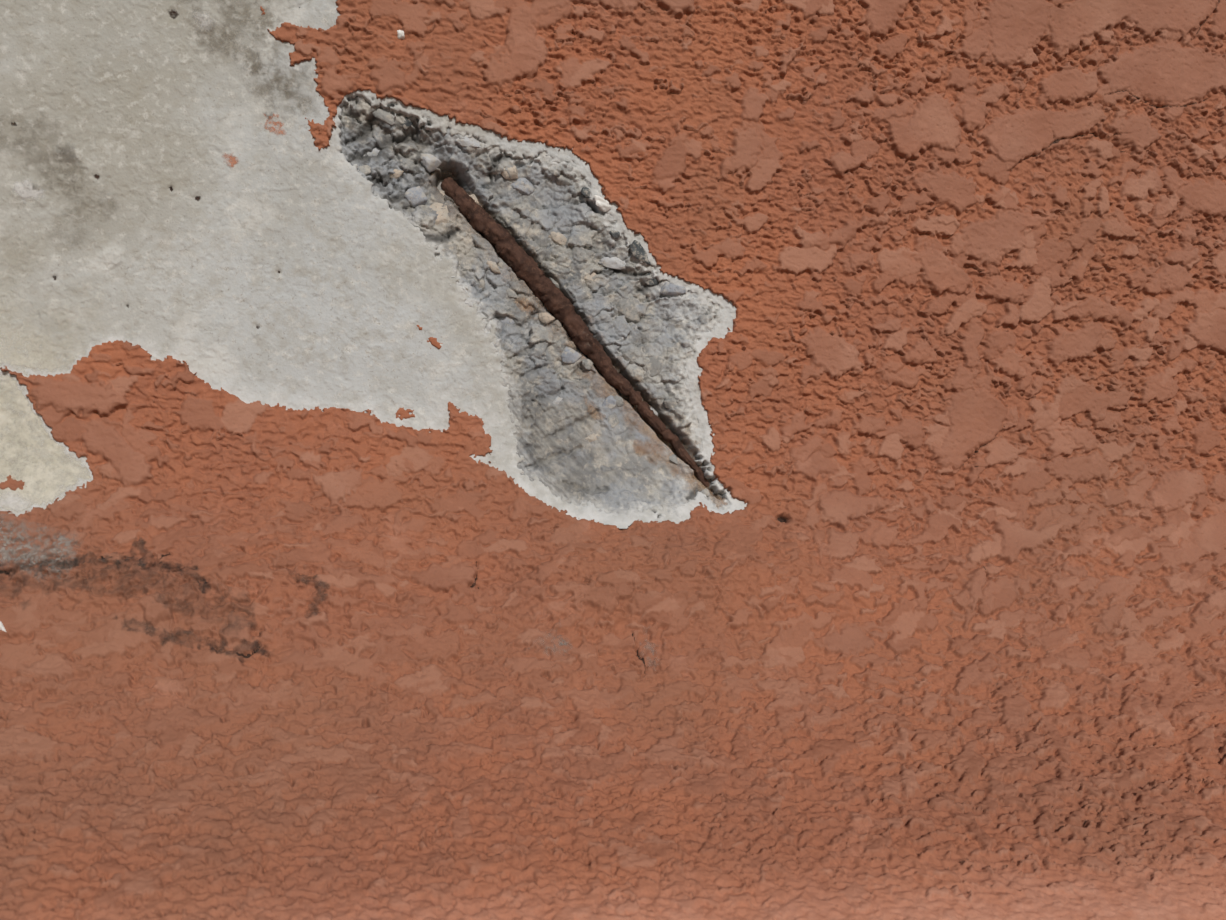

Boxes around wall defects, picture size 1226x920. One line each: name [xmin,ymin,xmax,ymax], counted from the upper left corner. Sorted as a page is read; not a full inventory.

peeling [0,0,747,529]